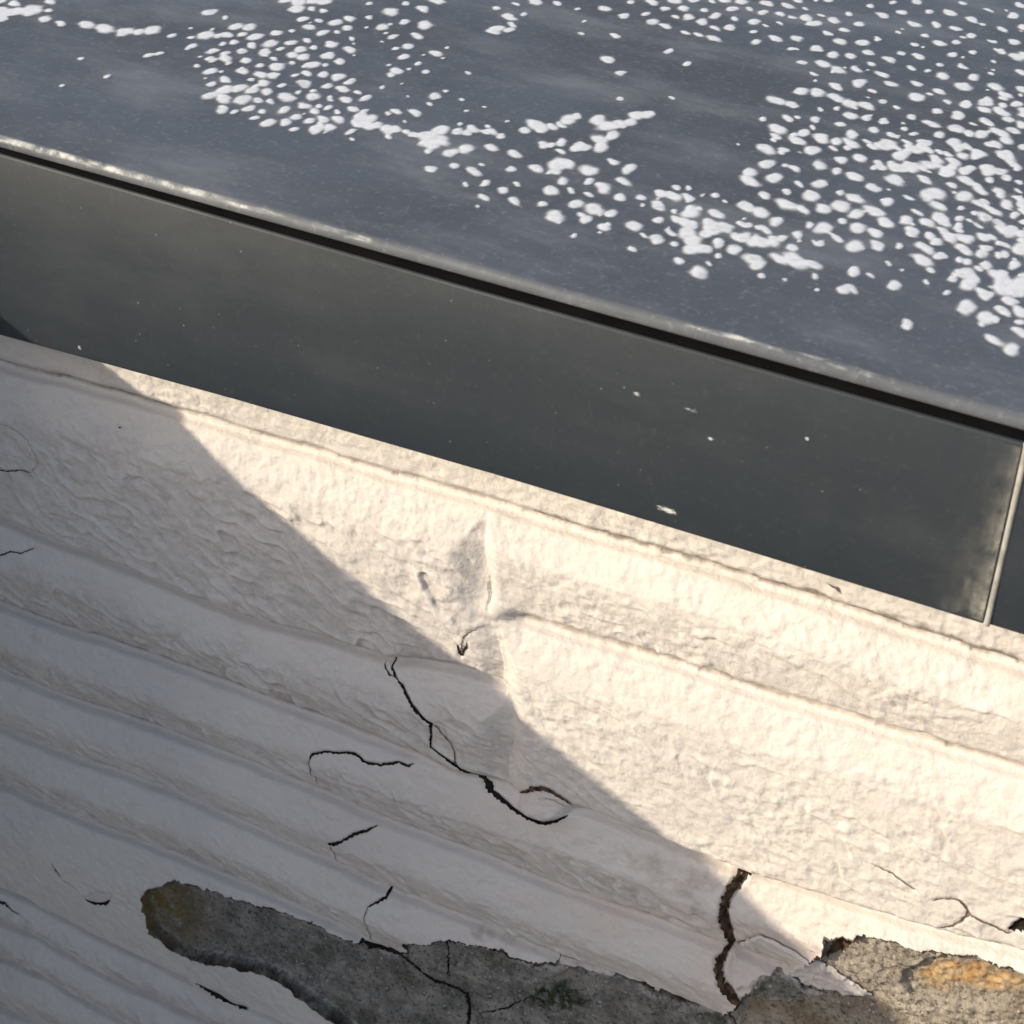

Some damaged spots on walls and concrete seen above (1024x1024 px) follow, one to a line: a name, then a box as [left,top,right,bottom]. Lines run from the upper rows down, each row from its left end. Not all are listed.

crack [457,629,476,656]
crack [308,657,568,826]
crack [328,825,377,861]
crack [357,886,533,1024]
spalling [140,879,1024,1024]
crack [713,868,752,1006]